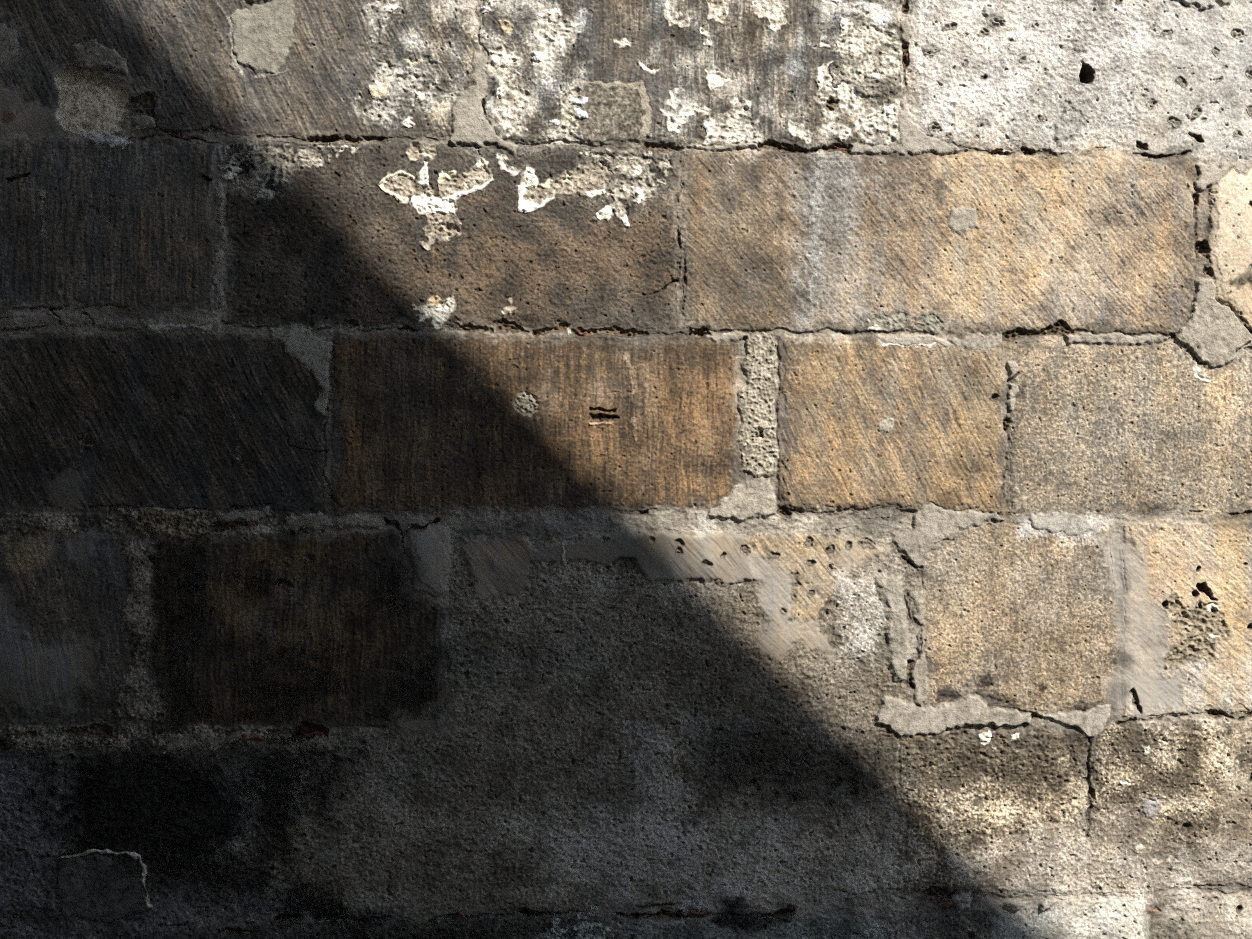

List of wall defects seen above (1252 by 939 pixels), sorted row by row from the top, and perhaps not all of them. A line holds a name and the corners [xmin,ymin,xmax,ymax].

spalling [665,0,730,45]
spalling [751,0,788,31]
spalling [814,0,902,144]
spalling [355,0,673,250]
spalling [660,67,763,145]
spalling [781,115,812,143]
spalling [201,142,359,201]
crack [1117,709,1252,726]
crack [1086,738,1095,838]